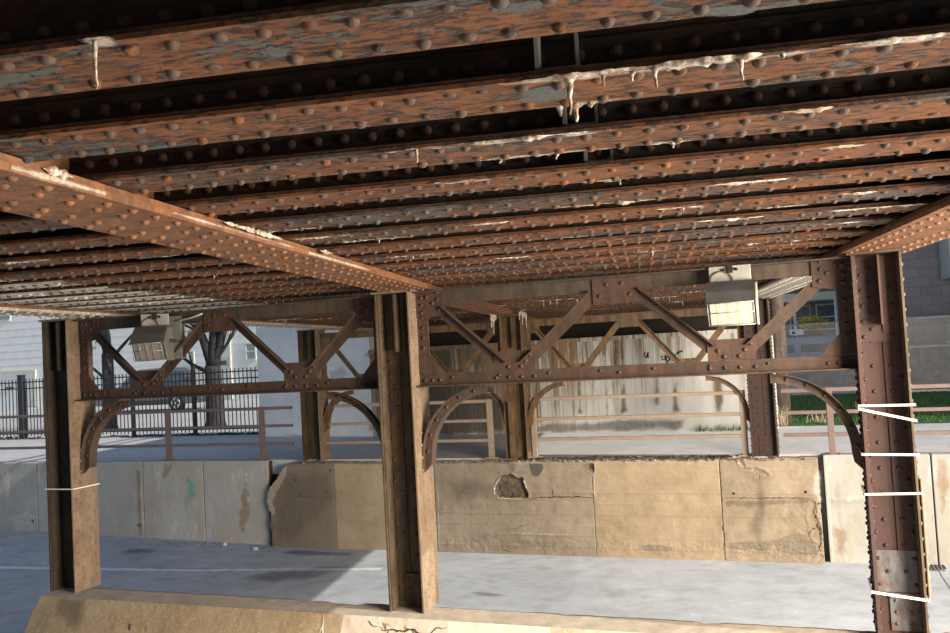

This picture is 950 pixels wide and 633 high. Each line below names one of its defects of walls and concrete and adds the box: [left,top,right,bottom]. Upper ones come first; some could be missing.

damp [835,32,950,47]
damp [83,36,114,89]
peeling [0,66,69,89]
damp [406,48,809,164]
damp [784,106,833,114]
spalling [494,474,529,500]
spalling [267,466,287,545]
crack [369,621,447,633]